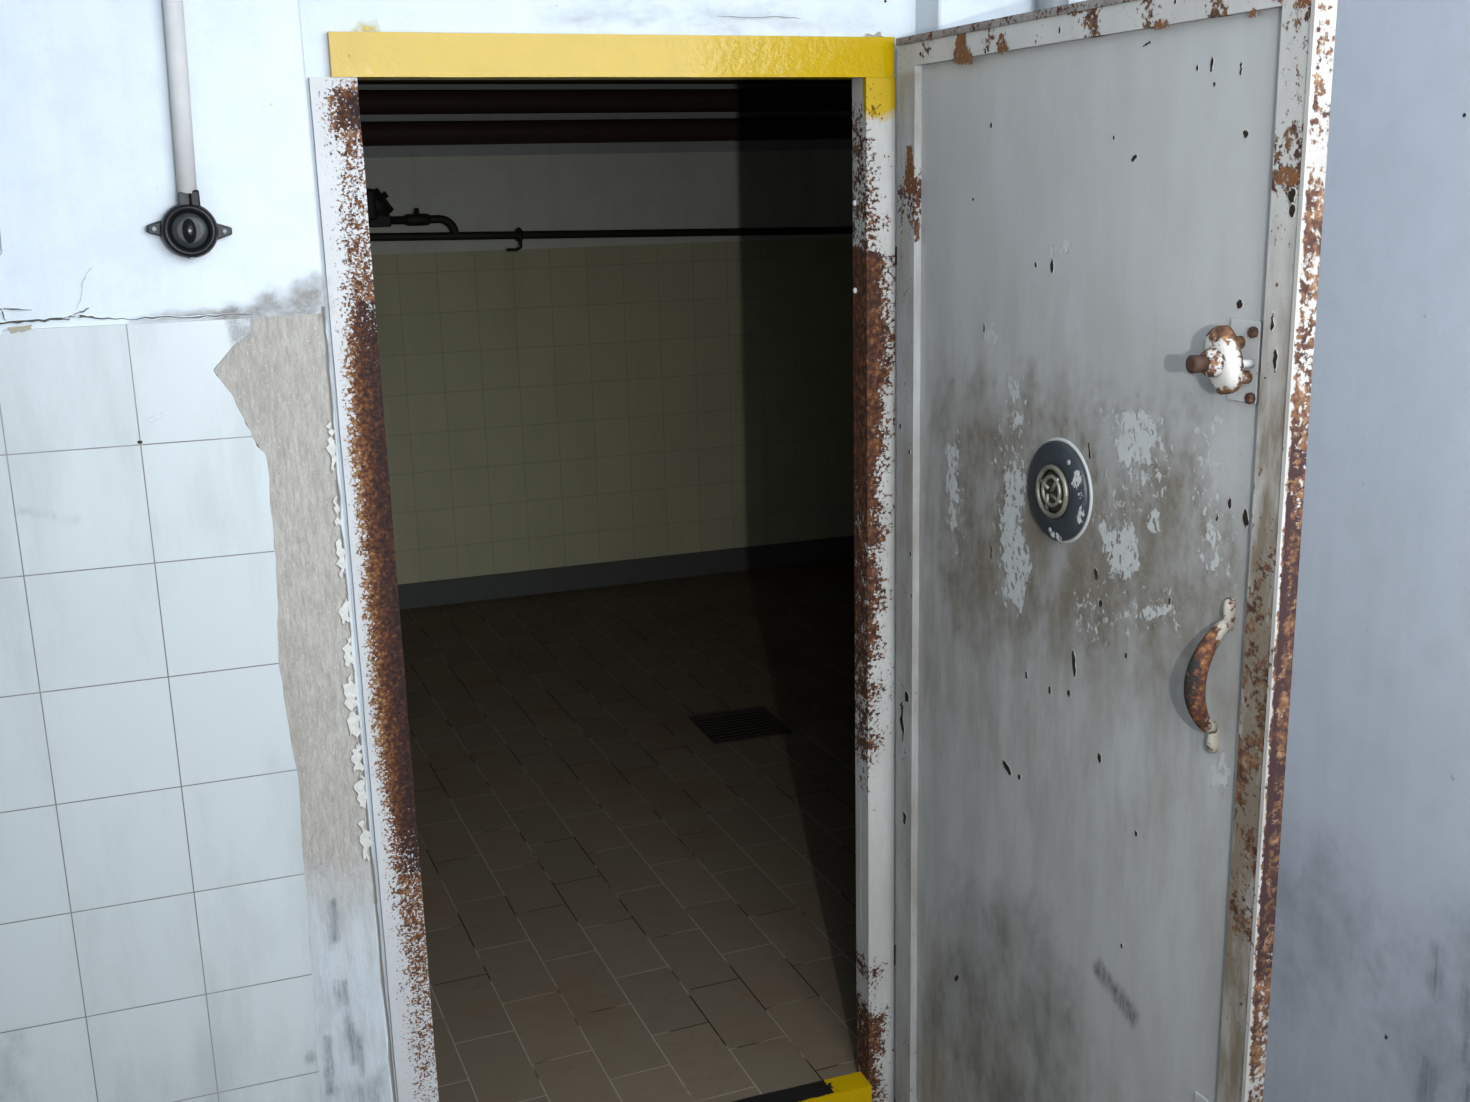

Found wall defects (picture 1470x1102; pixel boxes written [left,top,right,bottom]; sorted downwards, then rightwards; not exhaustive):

flaking render [214,313,391,1102]